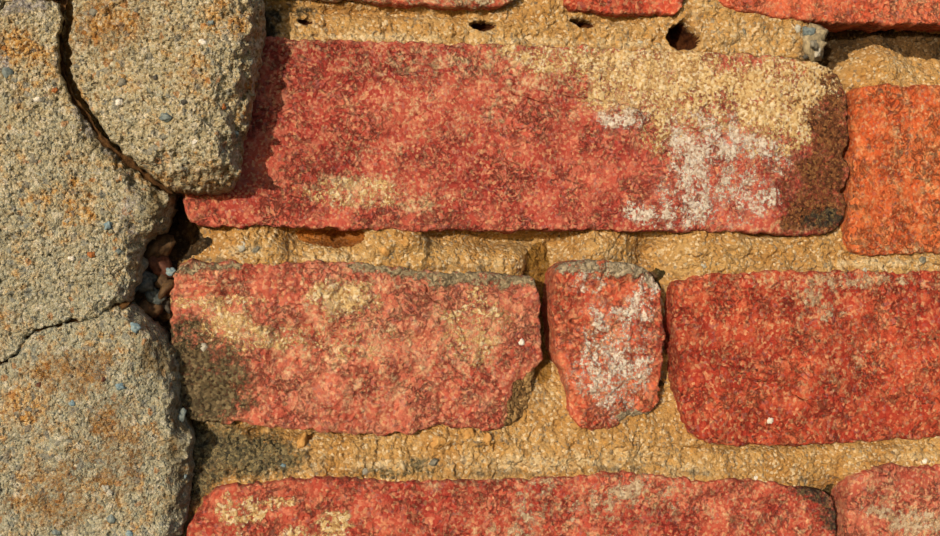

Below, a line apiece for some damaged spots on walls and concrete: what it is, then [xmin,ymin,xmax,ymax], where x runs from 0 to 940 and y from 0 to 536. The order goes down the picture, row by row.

crack [48,0,173,194]
damp [303,175,399,209]
damp [481,43,849,237]
crack [0,318,81,364]
crack [111,301,130,310]
damp [551,259,661,421]